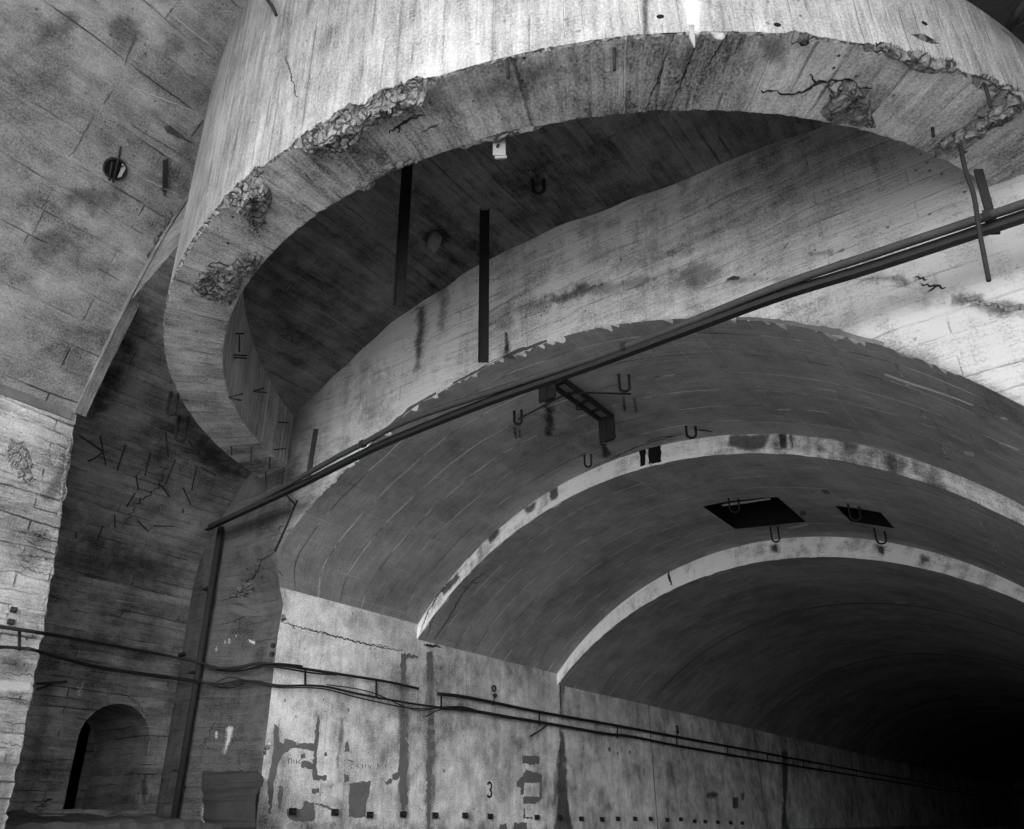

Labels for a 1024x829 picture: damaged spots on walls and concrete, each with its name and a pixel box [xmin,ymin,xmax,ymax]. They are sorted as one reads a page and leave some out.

crack [645,33,728,114]
crack [761,74,872,95]
spalling [875,34,959,74]
spalling [300,90,428,156]
spalling [190,252,263,306]
crack [915,275,946,292]
damp [415,306,424,368]
crack [220,524,285,628]
crack [285,573,484,651]
flaking render [261,715,333,822]
flaking render [344,774,371,820]
flaking render [385,720,409,811]